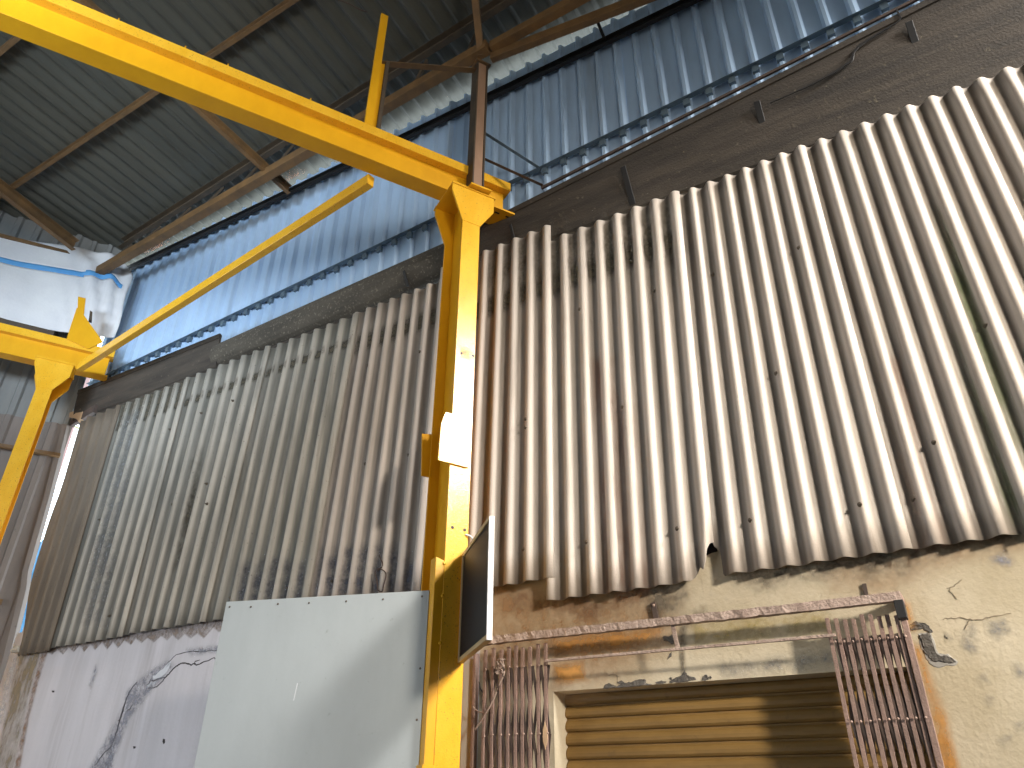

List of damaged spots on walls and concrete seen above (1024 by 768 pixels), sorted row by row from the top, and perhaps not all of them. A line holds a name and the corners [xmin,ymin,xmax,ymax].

crack [944,580,1011,628]
spalling [910,621,958,668]
spalling [602,670,712,689]
crack [95,650,217,765]
corrosion [934,707,956,768]